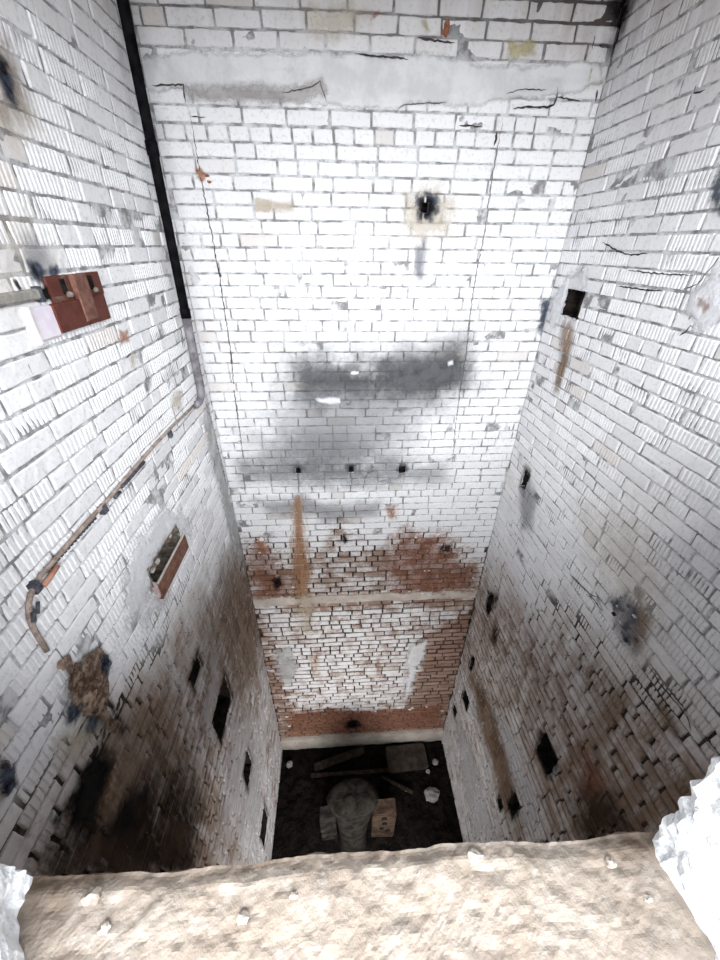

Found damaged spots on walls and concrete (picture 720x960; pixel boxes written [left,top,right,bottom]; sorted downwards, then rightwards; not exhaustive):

crack [283,81,327,102]
crack [153,83,245,485]
crack [452,88,598,460]
crack [602,242,720,291]
corrosion [555,326,572,391]
corrosion [293,501,309,599]
spalling [57,648,125,735]
leakage [45,747,202,876]